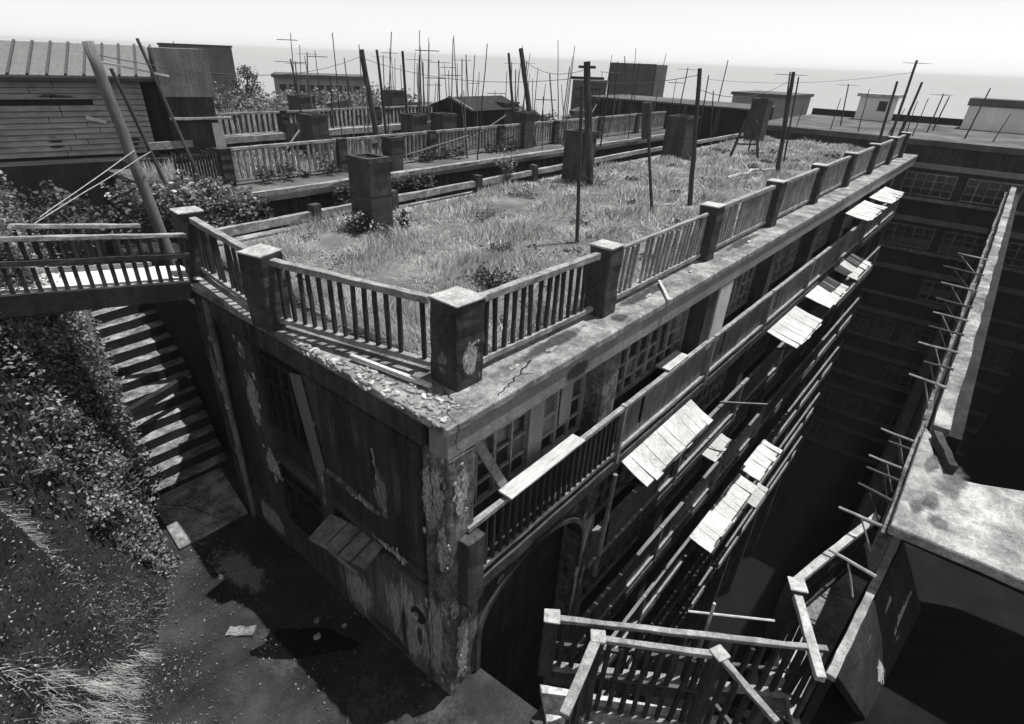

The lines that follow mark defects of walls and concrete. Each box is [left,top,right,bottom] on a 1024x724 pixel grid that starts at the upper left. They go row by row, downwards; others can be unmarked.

peeling [232,334,263,426]
peeling [462,339,480,377]
crack [442,360,534,451]
peeling [263,444,284,483]
peeling [422,454,469,572]
peeling [441,599,471,676]